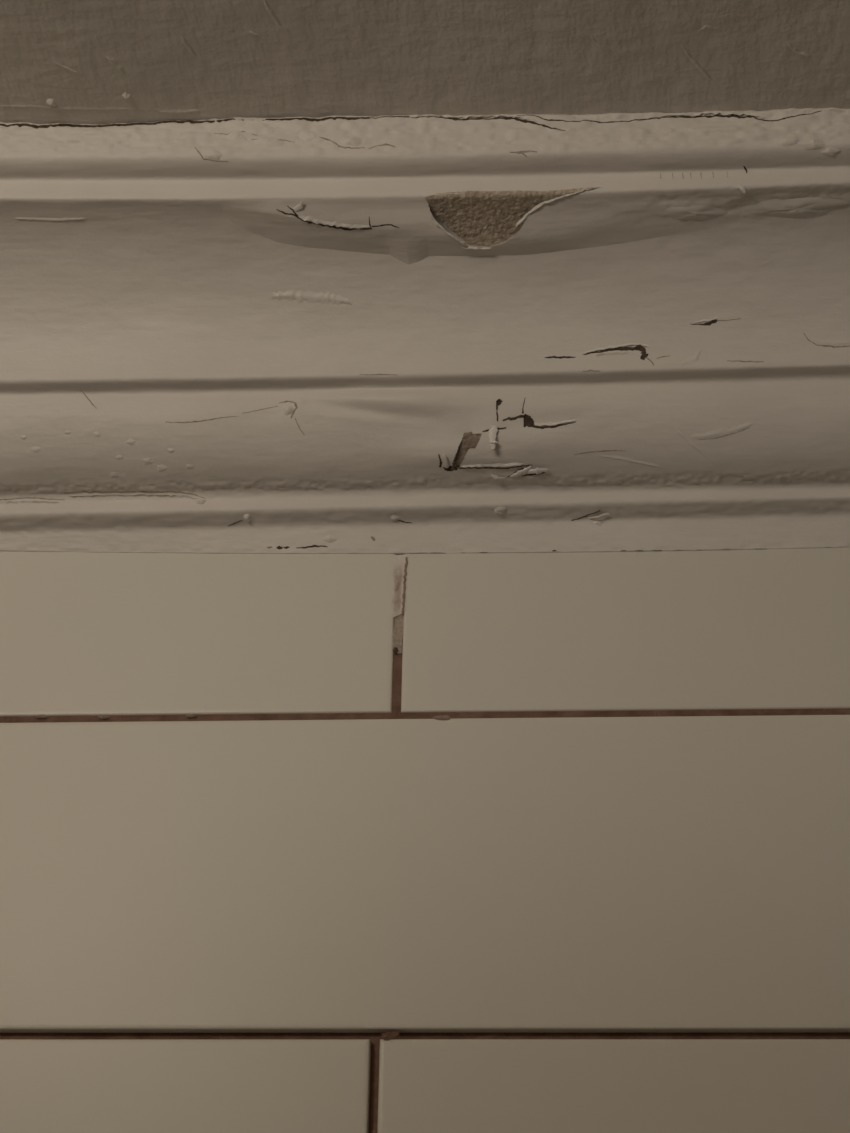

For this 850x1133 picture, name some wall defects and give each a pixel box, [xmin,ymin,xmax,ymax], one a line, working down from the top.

crack [0,111,821,131]
crack [276,200,399,230]
peeling [425,187,601,250]
crack [545,343,667,372]
peeling [438,399,577,480]